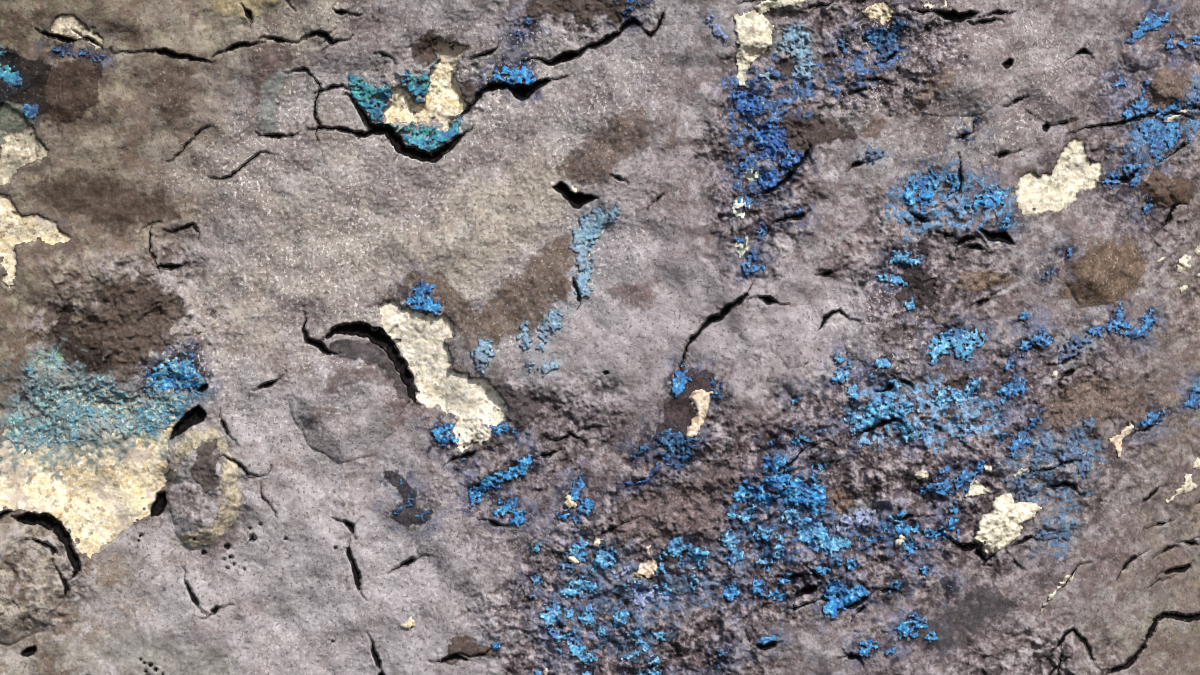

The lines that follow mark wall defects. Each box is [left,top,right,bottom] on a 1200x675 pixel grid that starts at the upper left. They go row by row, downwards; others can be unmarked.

spalling [0,47,71,288]
crack [36,5,664,179]
spalling [347,38,468,154]
spalling [964,77,1200,230]
crack [302,316,420,405]
spalling [378,279,518,461]
crack [680,283,787,370]
crack [0,511,80,597]
spalling [0,347,206,559]
crack [335,519,427,600]
spalling [529,302,1156,675]
crack [1048,613,1200,675]